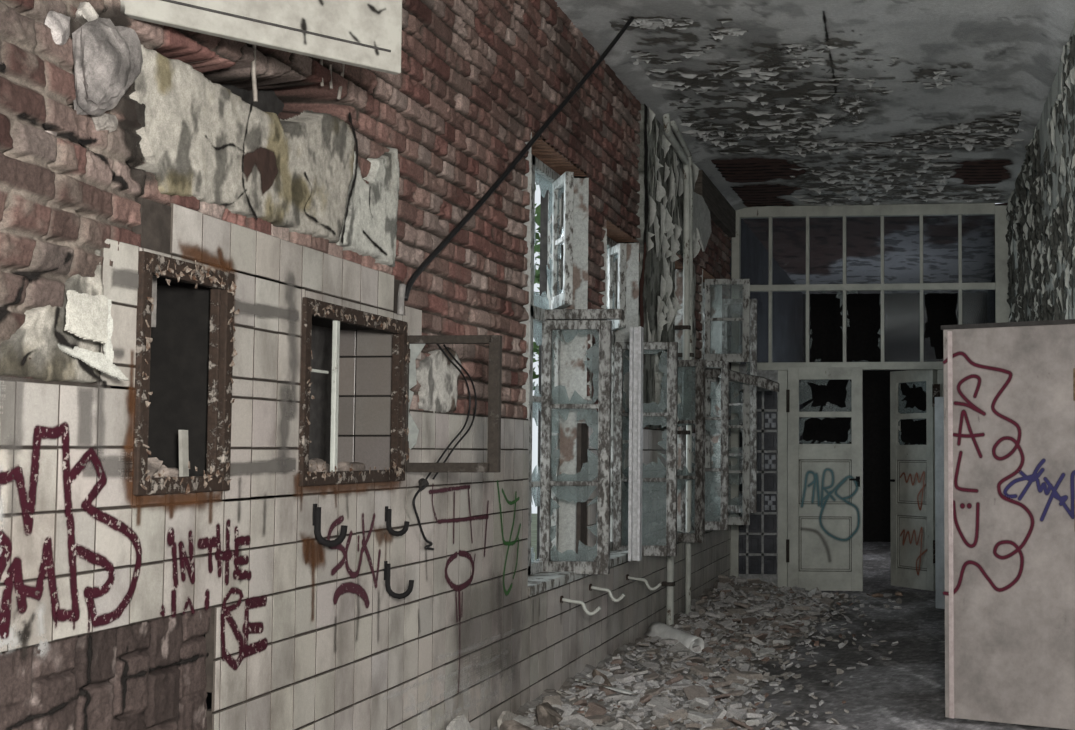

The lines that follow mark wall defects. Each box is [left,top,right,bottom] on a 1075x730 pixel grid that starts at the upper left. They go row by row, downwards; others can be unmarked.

spalling [65,7,131,37]
flaking render [113,44,400,267]
peeling [610,16,1075,322]
flaking render [0,249,129,383]
rust [124,351,221,525]
rust [180,245,234,273]
flaking render [416,347,461,413]
flaking render [634,104,701,430]
peeling [0,607,212,730]